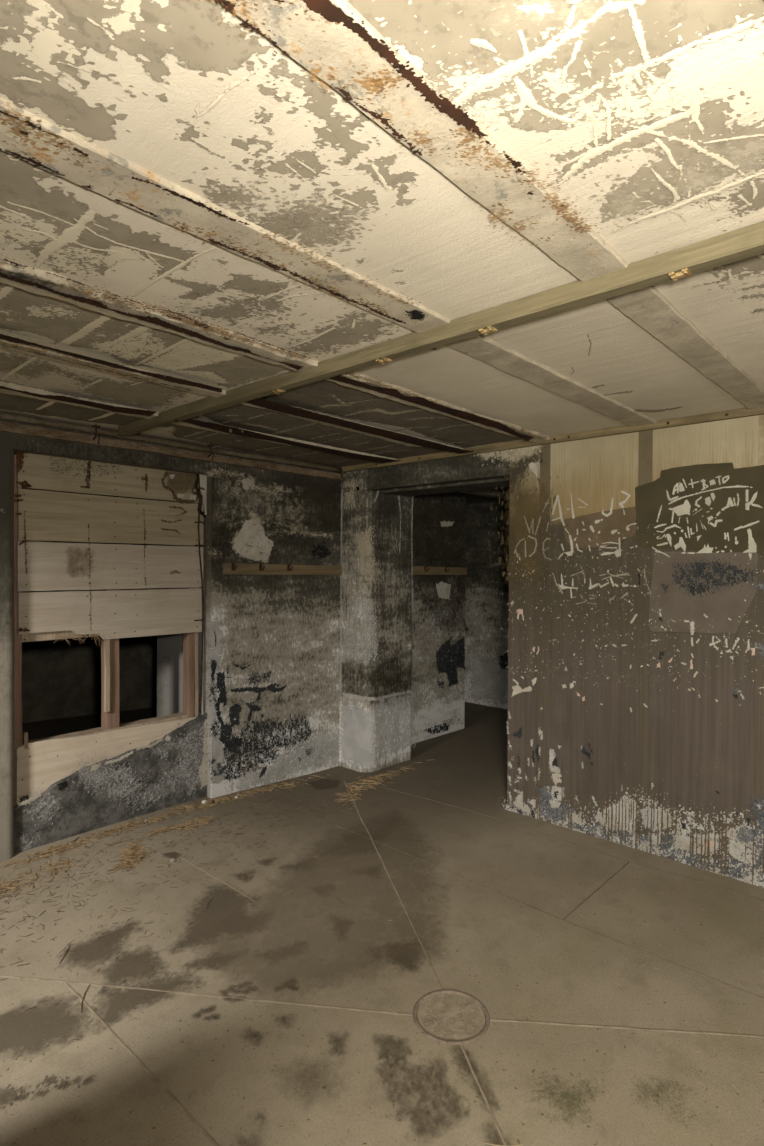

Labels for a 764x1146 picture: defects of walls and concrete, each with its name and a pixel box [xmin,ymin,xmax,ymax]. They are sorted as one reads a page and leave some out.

peeling [0,0,418,267]
corrosion [210,0,289,60]
corrosion [274,0,599,245]
peeling [434,41,688,134]
peeling [0,150,399,358]
leakage [141,468,244,534]
peeling [231,512,276,563]
leakage [162,380,522,766]
leakage [15,722,205,852]
peeling [435,636,764,888]
leakage [173,873,272,951]
leakage [0,923,192,1054]